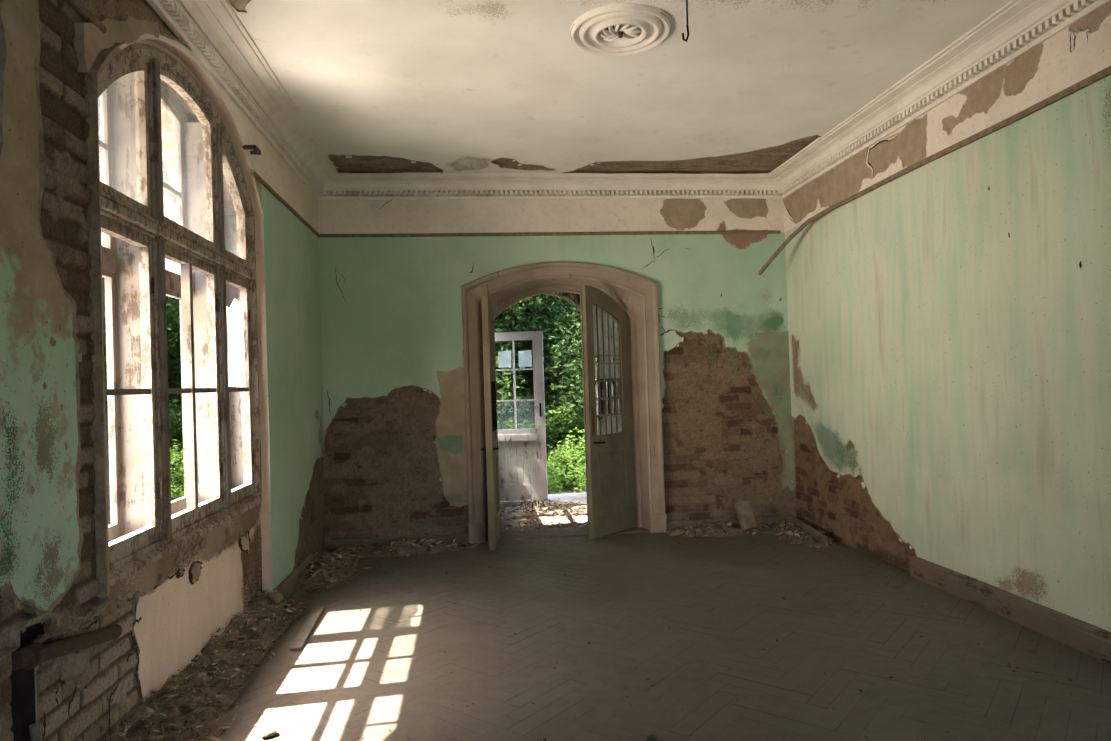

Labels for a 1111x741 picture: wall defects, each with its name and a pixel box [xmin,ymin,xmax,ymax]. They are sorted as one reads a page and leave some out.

peeling [1069,1,1111,52]
peeling [942,42,1044,136]
flaking render [328,154,443,174]
flaking render [491,135,821,174]
peeling [660,199,707,230]
peeling [717,199,769,250]
peeling [783,114,927,224]
flaking render [0,0,261,741]
leakage [0,406,29,589]
flaking render [293,366,469,569]
flaking render [662,329,917,571]
crack [81,572,178,741]